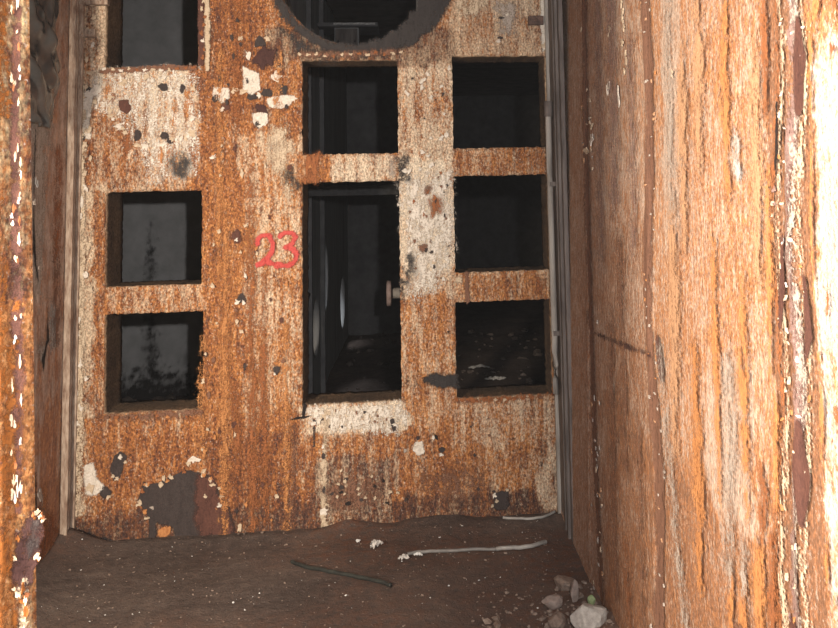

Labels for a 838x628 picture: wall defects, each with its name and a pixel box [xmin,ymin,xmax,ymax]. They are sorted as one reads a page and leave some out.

rust [0,247,24,628]
peeling [8,0,46,628]
crack [32,129,43,282]
crack [37,303,57,372]
peeling [75,42,216,517]
spalling [136,456,242,538]
rust [97,0,299,535]
peeling [212,35,298,173]
rust [298,47,403,59]
rust [424,186,443,219]
rust [591,0,723,628]
rust [727,0,780,628]